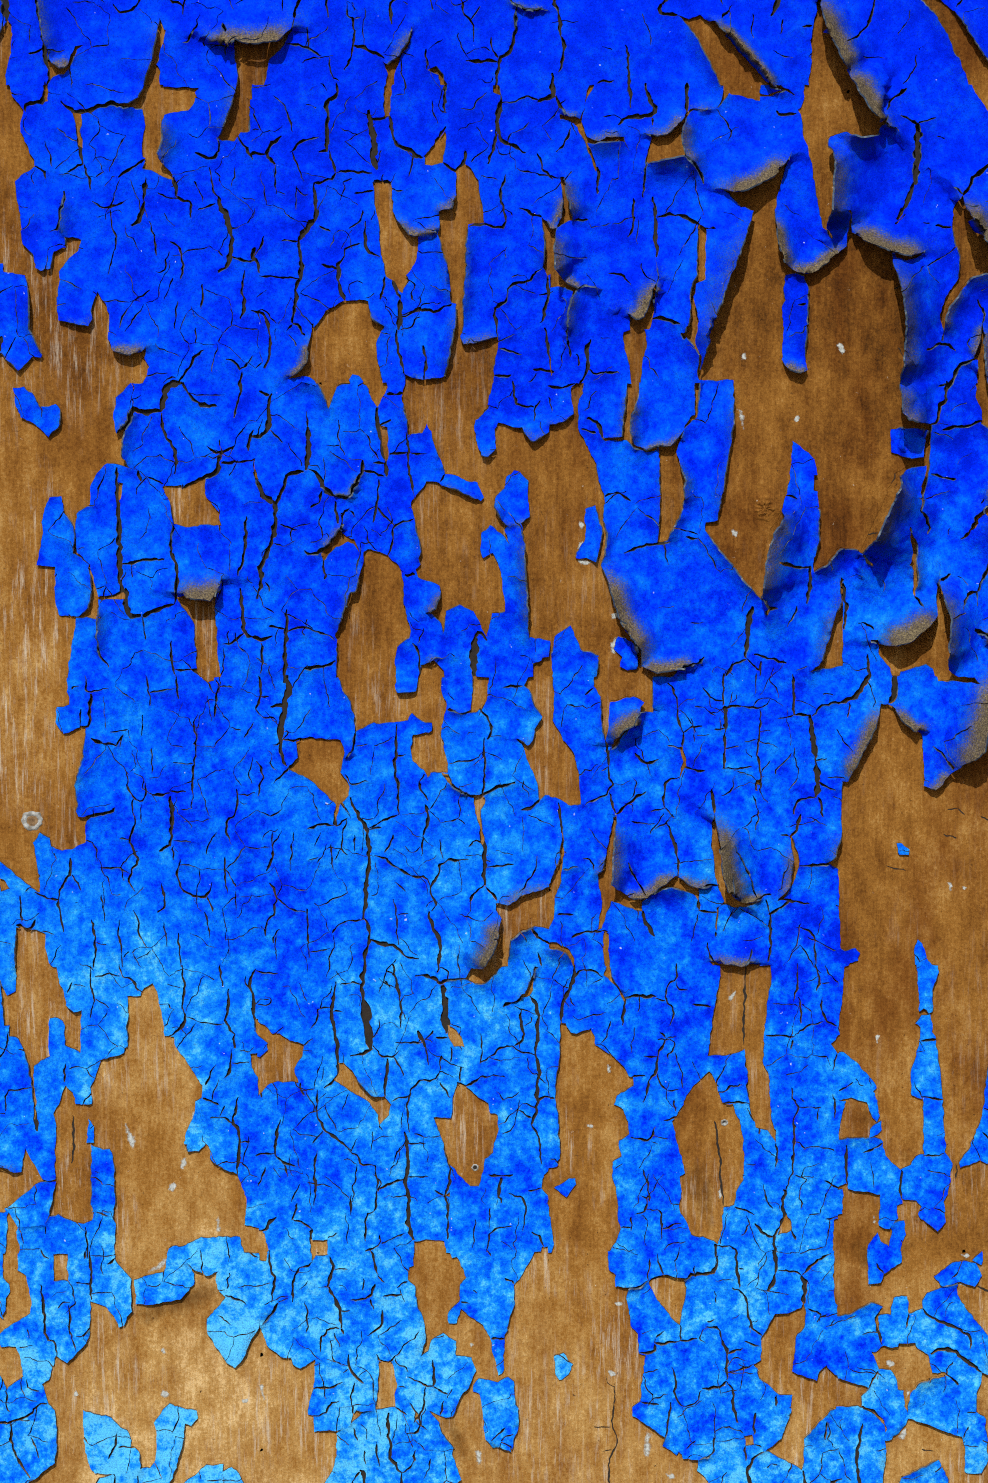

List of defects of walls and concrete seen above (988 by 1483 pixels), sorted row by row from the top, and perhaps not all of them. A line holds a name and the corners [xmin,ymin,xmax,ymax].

peeling [117,10,308,180]
crack [575,0,733,297]
crack [847,0,988,264]
peeling [0,21,150,892]
peeling [163,478,221,527]
crack [0,0,720,1483]
peeling [278,0,988,1483]
crack [579,532,897,870]
peeling [1,926,82,1119]
peeling [0,983,397,1483]
crack [623,854,888,1483]
crack [906,1308,984,1446]